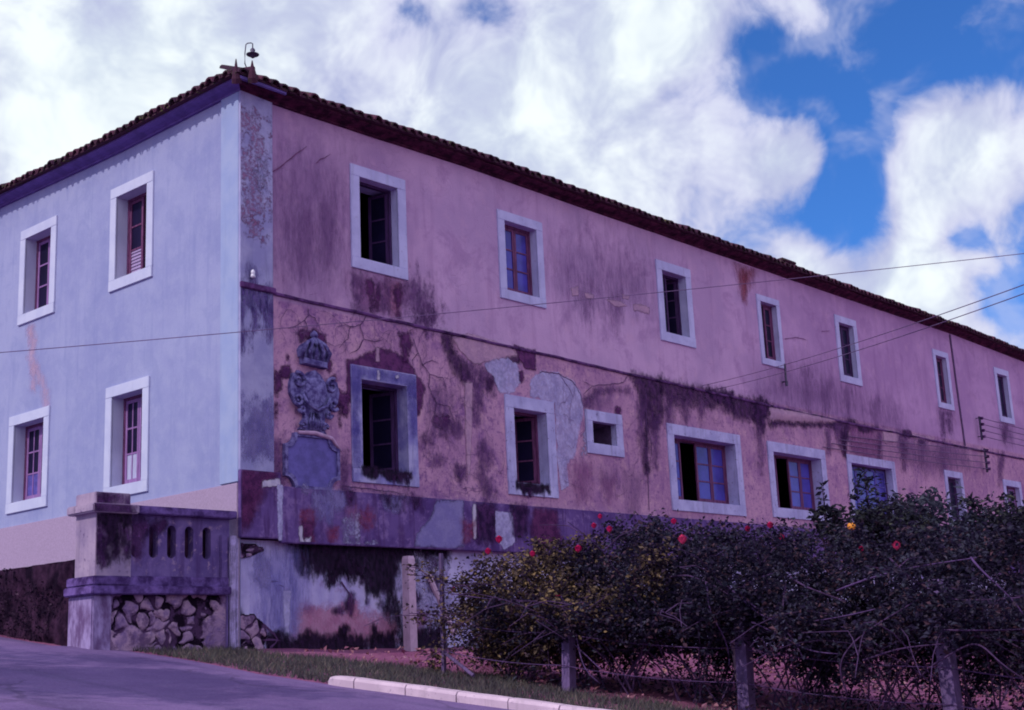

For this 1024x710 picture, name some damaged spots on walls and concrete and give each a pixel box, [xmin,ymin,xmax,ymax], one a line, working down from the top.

peeling [241,106,272,242]
damp [241,268,274,352]
rust [739,269,754,300]
damp [242,355,292,529]
crack [280,309,505,501]
damp [327,275,562,549]
peeling [454,333,587,490]
damp [584,373,771,474]
peeling [262,478,283,540]
peeling [299,483,362,542]
damp [274,544,451,650]
peeling [414,500,465,630]